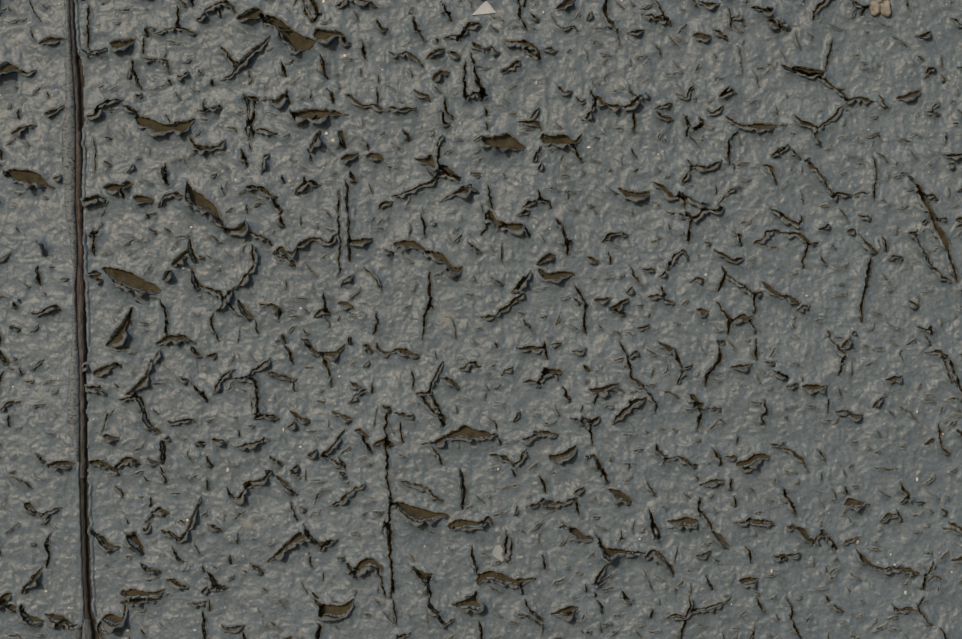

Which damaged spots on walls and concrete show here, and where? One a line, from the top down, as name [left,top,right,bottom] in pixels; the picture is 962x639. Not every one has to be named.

peeling [219,5,353,81]
peeling [122,104,227,157]
peeling [266,86,349,163]
peeling [472,118,586,172]
peeling [102,178,248,237]
peeling [101,236,204,348]
peeling [266,522,339,563]
peeling [394,467,538,615]
peeling [560,520,679,588]
peeling [0,566,77,630]
peeling [96,586,166,639]
peeling [313,597,355,639]